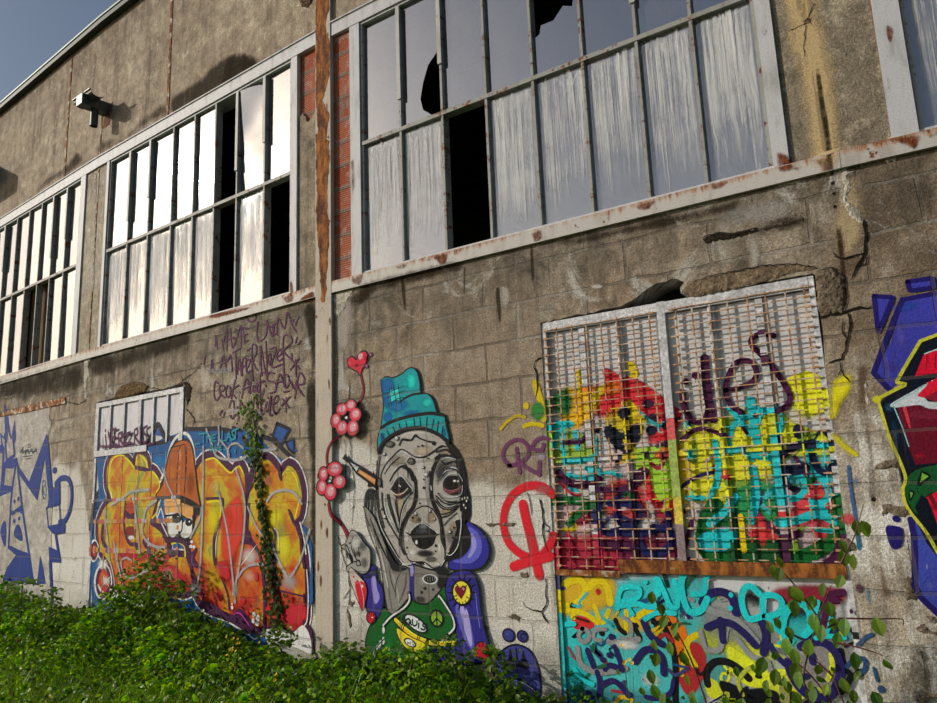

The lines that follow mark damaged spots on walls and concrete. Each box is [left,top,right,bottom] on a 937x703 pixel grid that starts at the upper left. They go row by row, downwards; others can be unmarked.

rust [285,0,330,303]
rust [778,154,796,171]
rust [897,136,918,148]
spalling [702,218,804,244]
crack [834,220,870,278]
crack [819,306,872,383]
spalling [114,381,148,399]
spalling [183,382,192,405]